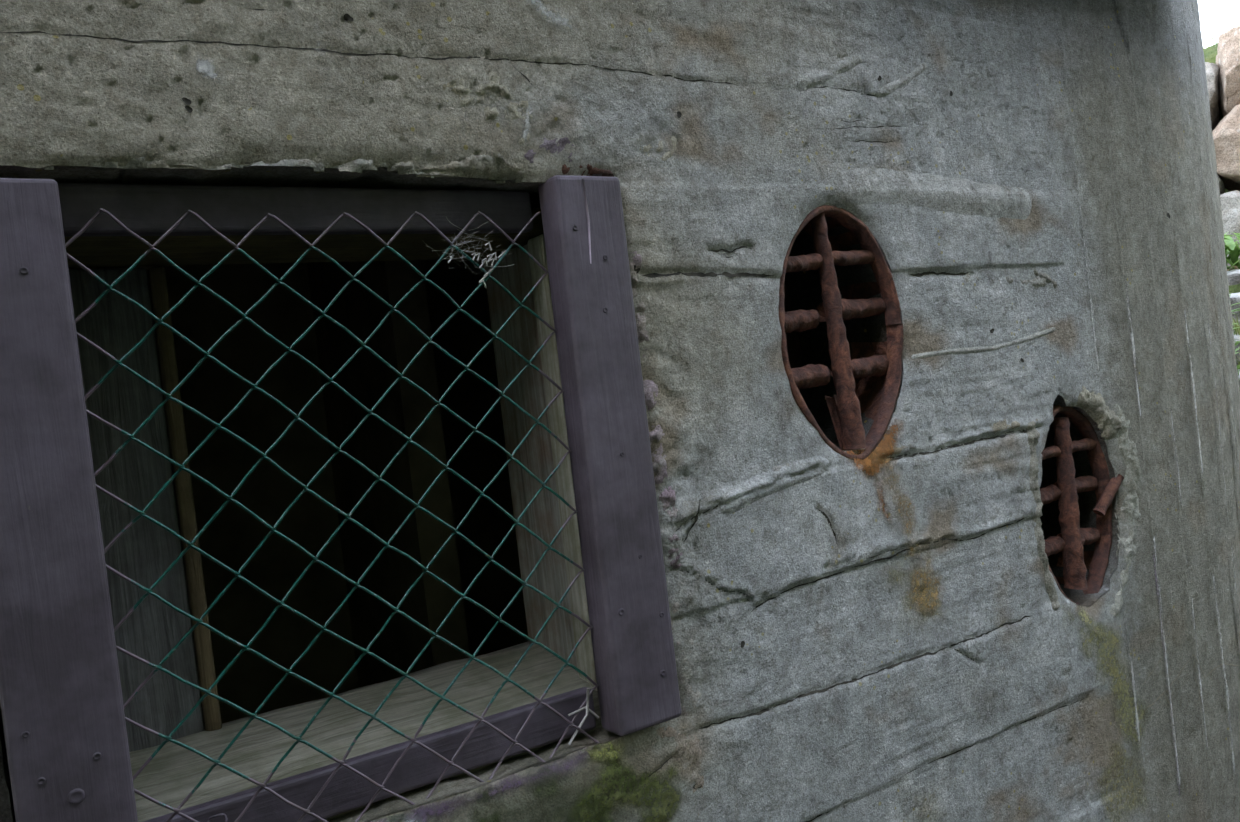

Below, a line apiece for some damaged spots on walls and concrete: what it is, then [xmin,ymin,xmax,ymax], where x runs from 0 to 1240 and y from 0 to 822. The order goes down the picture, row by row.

spalling [1026,421,1060,611]
spalling [1070,386,1141,616]